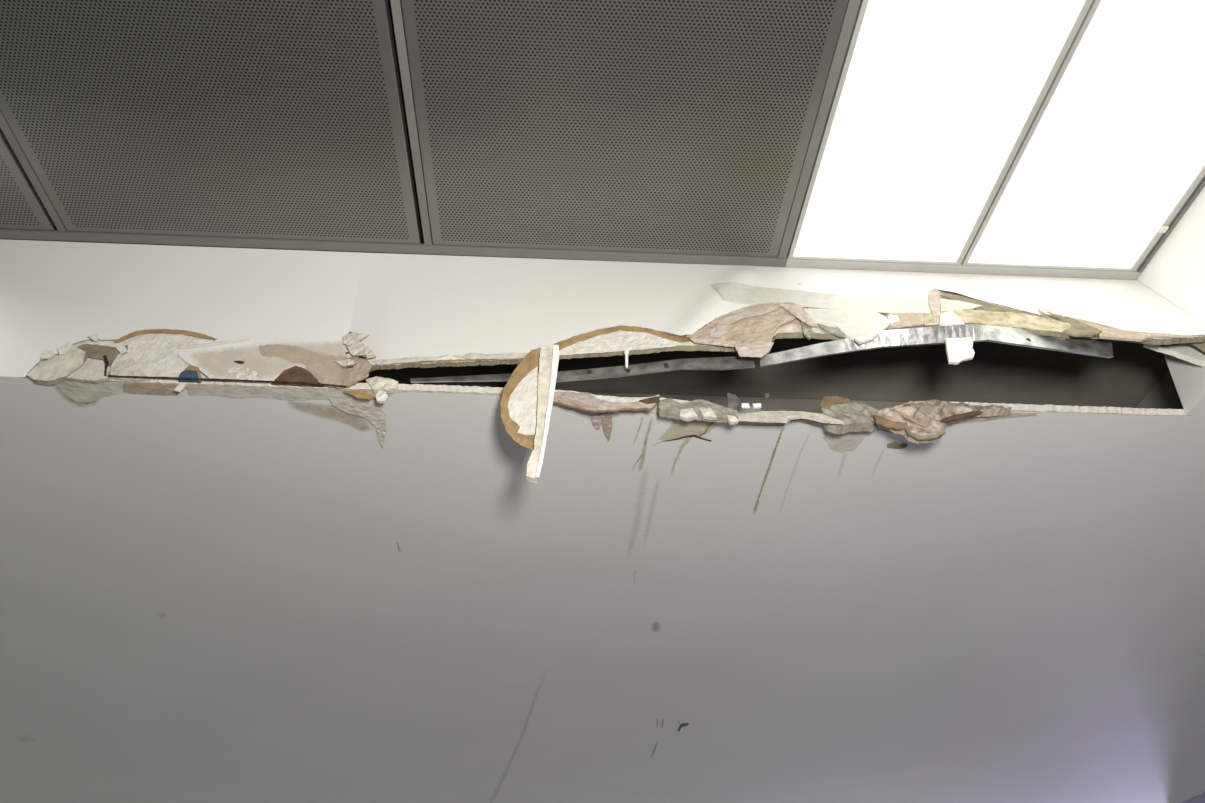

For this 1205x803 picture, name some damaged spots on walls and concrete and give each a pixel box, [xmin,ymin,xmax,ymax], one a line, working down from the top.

spalling [711,282,1193,365]
spalling [27,329,386,448]
spalling [736,411,869,453]